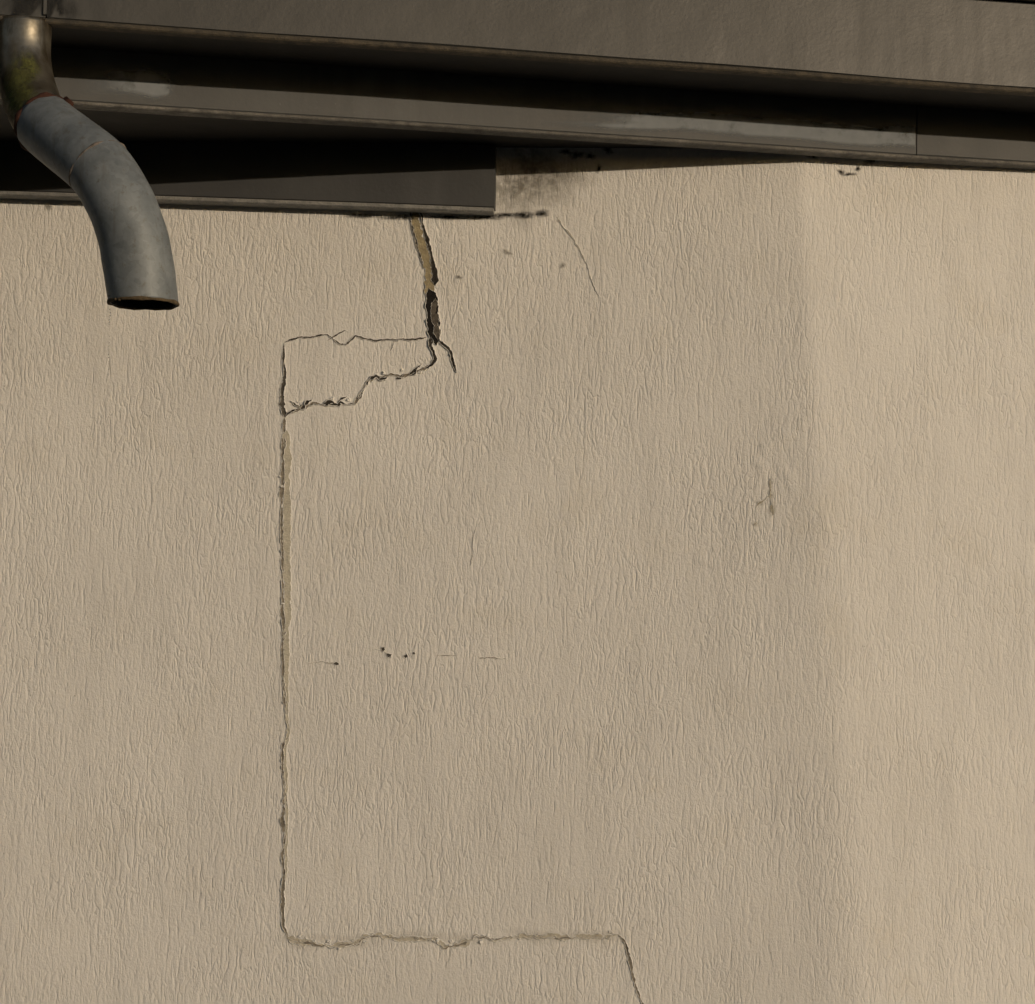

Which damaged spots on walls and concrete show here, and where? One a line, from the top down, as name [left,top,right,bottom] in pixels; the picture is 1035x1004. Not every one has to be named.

crack [278,213,644,1004]